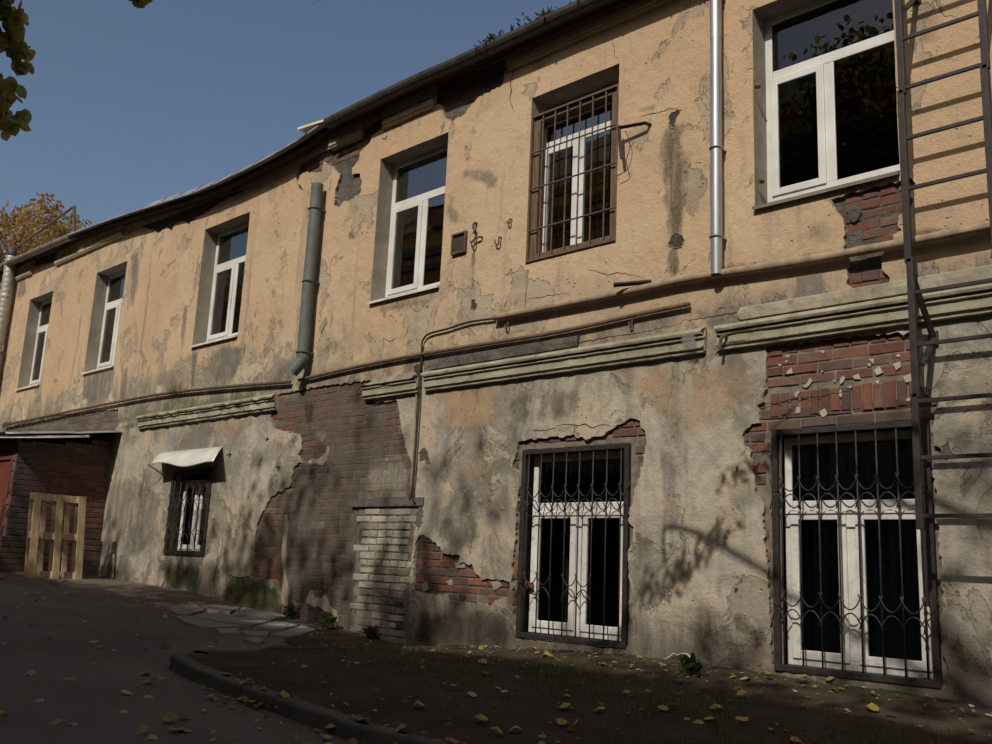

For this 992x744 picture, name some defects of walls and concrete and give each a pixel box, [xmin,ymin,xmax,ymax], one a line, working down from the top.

spalling [296,116,387,207]
spalling [437,58,506,129]
leakage [665,127,684,274]
spalling [831,178,915,288]
spalling [251,363,646,650]
spalling [742,332,954,686]